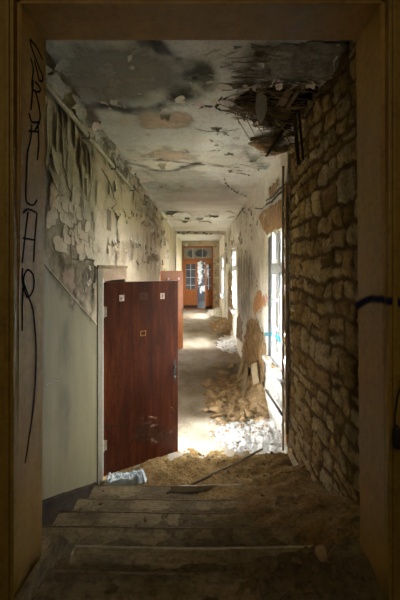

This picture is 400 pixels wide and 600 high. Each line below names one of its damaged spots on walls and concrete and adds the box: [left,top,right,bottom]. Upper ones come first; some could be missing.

damp [63,40,181,113]
spalling [203,43,283,91]
peeling [45,54,286,434]